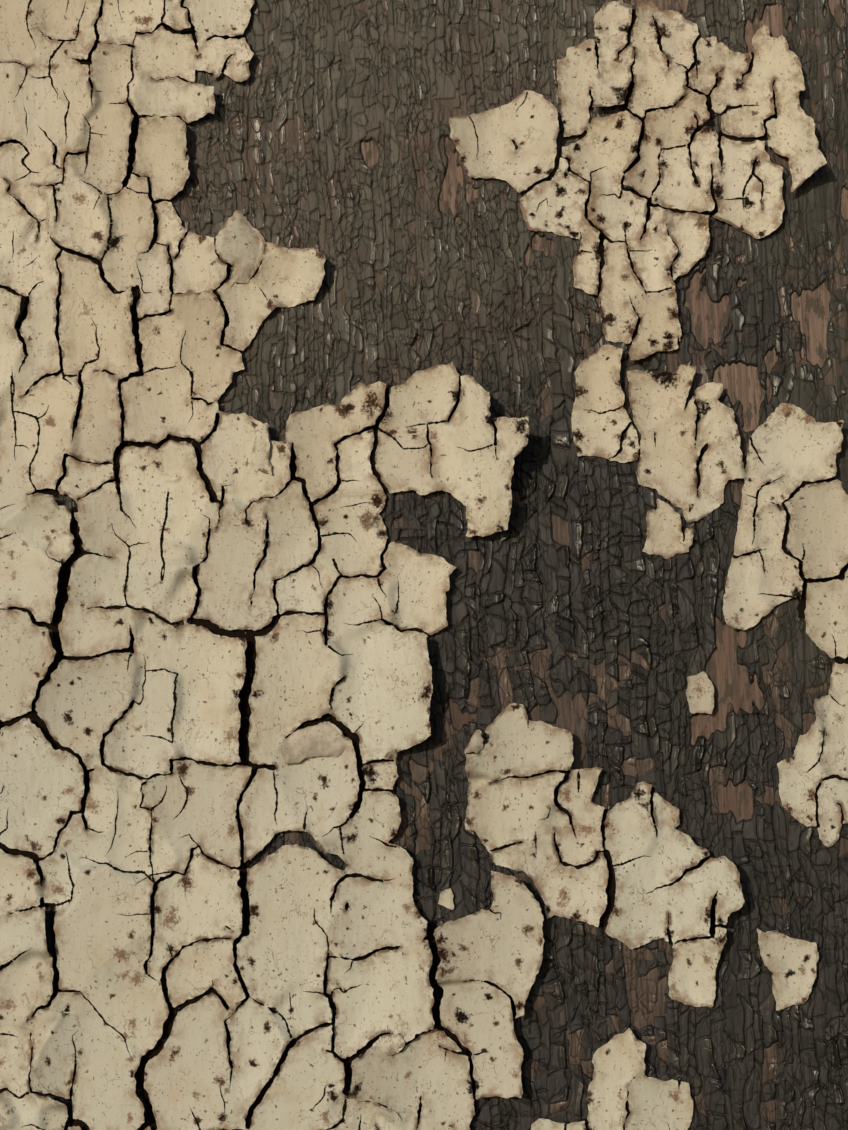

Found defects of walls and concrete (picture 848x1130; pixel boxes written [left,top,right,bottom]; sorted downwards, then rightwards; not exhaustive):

crack [558,9,778,345]
peeling [439,0,848,847]
crack [0,0,497,1130]
peeling [0,0,544,1130]
crack [733,437,848,618]
crack [472,979,517,1017]
crack [489,770,658,927]
peeling [464,703,745,1008]
peeling [531,1028,693,1130]
crack [646,857,726,946]
peeling [757,928,819,1011]
crack [807,735,848,827]